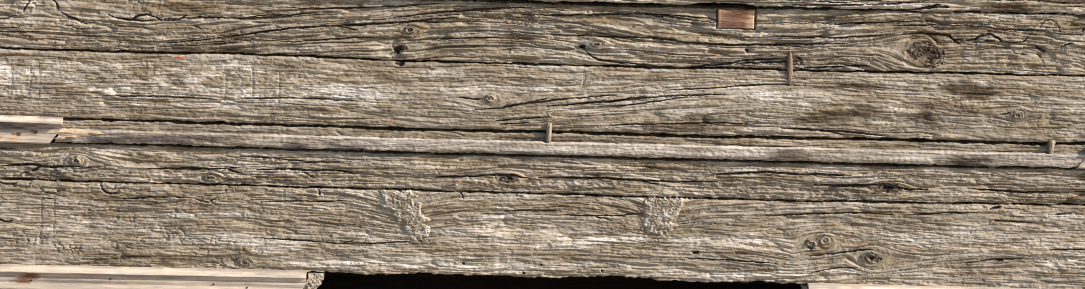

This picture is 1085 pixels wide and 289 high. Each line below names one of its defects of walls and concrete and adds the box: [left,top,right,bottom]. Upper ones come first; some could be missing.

crack [0,0,1085,126]